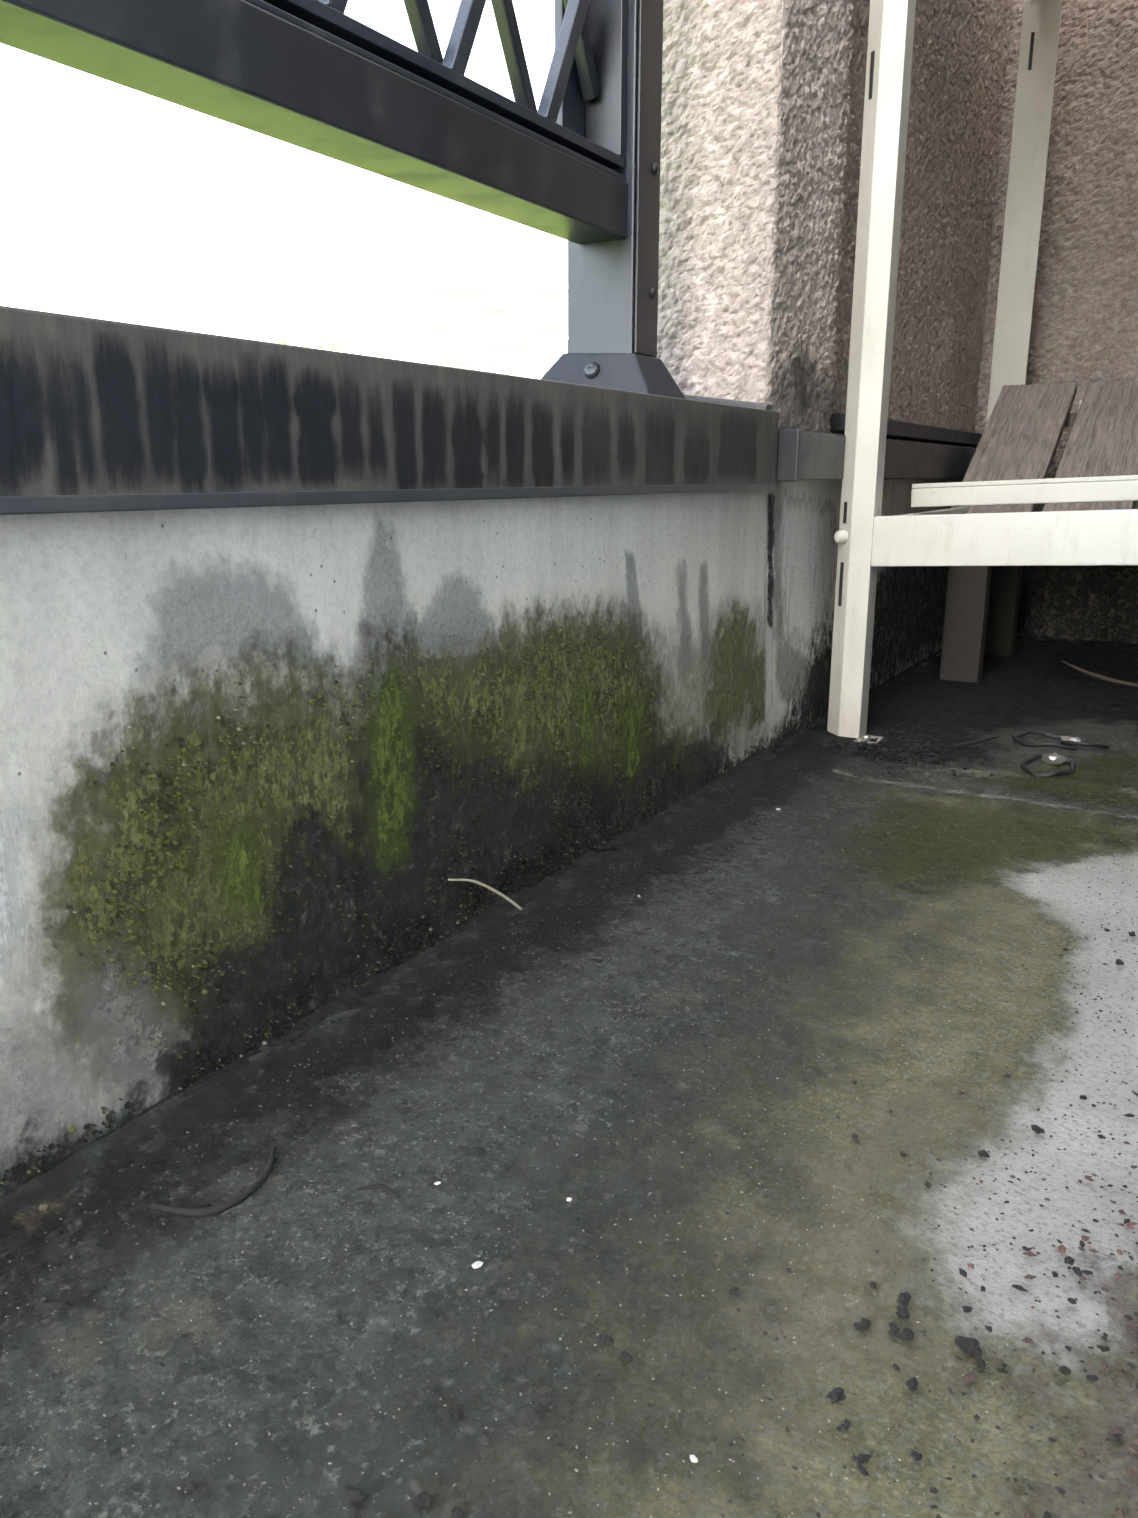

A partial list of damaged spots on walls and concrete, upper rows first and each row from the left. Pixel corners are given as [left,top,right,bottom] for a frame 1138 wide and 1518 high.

damp [0,336,574,492]
damp [0,490,1138,1518]